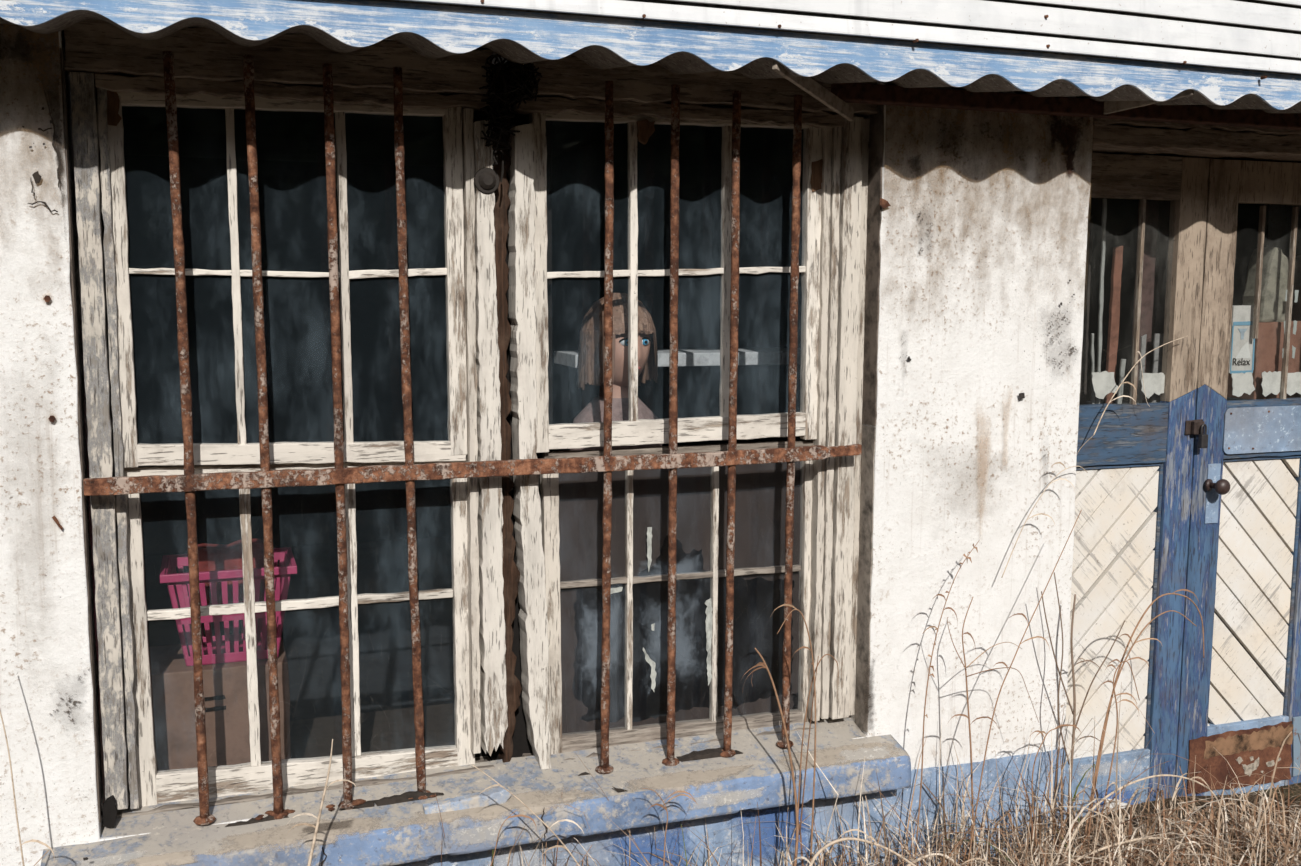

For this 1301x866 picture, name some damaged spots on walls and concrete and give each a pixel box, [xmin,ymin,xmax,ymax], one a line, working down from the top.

water stain [1037,280,1078,374]
peeling [72,850,196,866]
peeling [212,786,596,866]